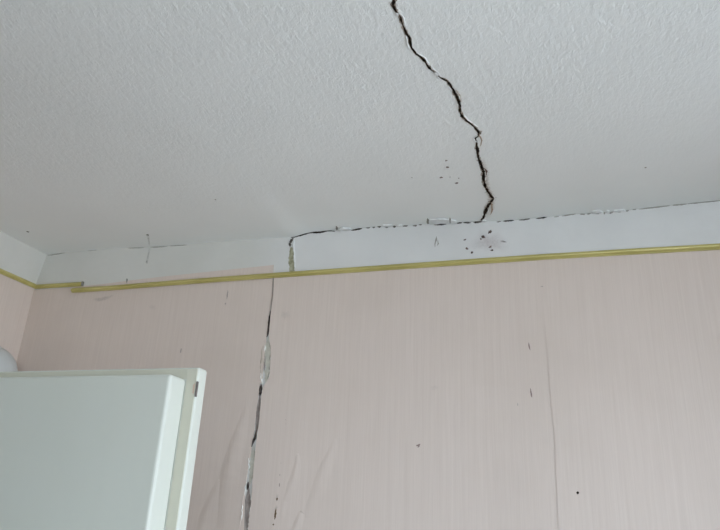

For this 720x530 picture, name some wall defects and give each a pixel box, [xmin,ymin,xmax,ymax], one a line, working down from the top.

crack [241,0,720,530]